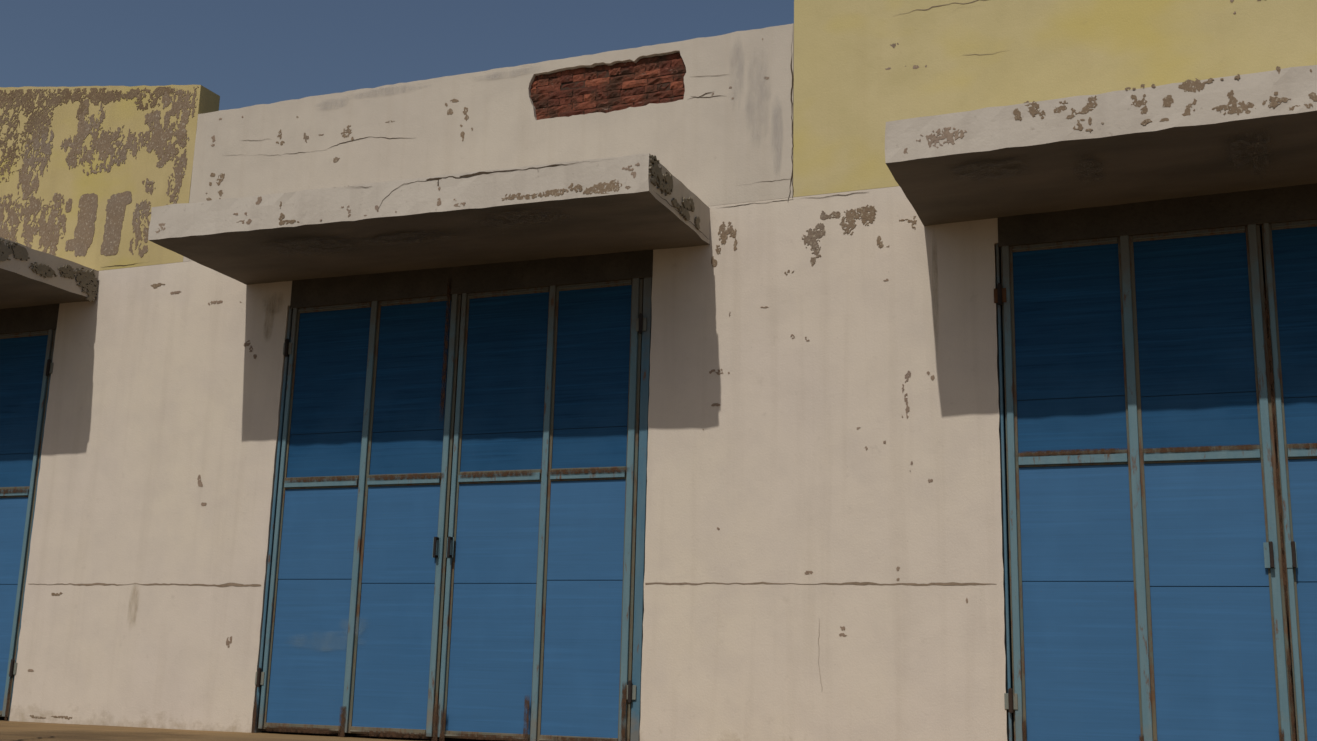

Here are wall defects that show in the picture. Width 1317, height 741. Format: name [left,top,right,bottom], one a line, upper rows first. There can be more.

flaking render [530,52,686,120]
peeling [1013,95,1104,133]
peeling [1125,74,1317,125]
crack [239,137,396,156]
peeling [0,86,199,302]
crack [364,159,605,211]
peeling [501,155,700,230]
peeling [711,221,737,267]
peeling [802,204,889,266]